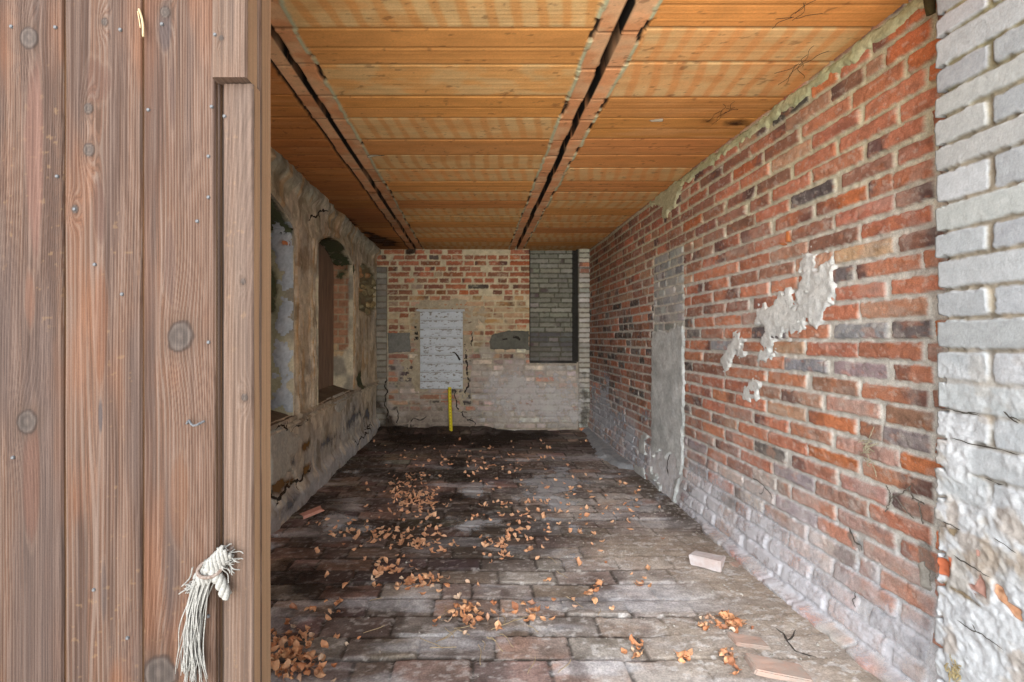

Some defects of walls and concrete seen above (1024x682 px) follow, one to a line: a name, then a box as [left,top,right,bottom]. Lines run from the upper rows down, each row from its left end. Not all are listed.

crack [355,333,476,445]
crack [937,407,1020,423]
crack [953,438,1019,455]
crack [271,467,311,506]
spalling [937,557,952,577]
spalling [970,575,1023,621]